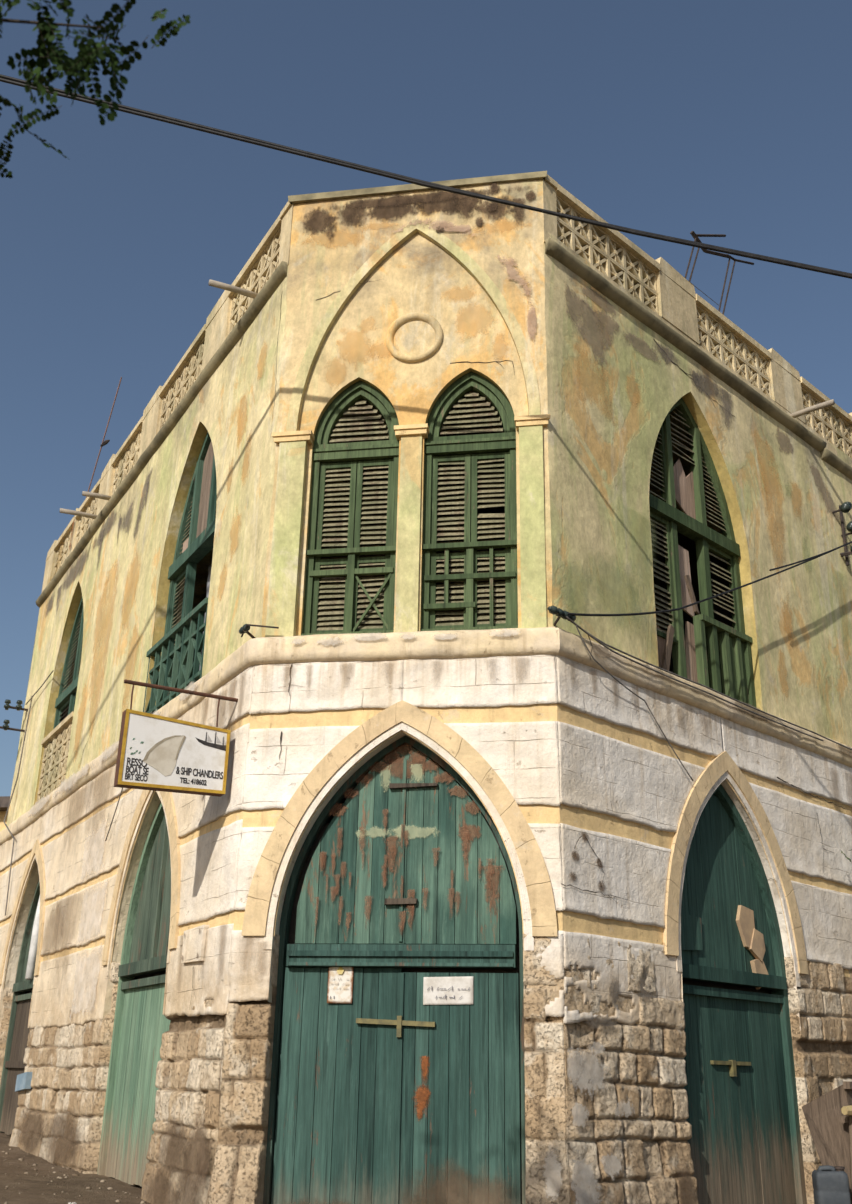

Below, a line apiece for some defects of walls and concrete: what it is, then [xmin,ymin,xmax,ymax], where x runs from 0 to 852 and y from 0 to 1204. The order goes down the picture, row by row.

leakage [303,187,529,238]
flaking render [527,965,635,1017]
corrosion [415,1056,431,1119]
peeling [572,1103,589,1127]
peeling [615,1101,635,1117]
peeling [543,1146,562,1200]
peeling [601,1154,621,1179]